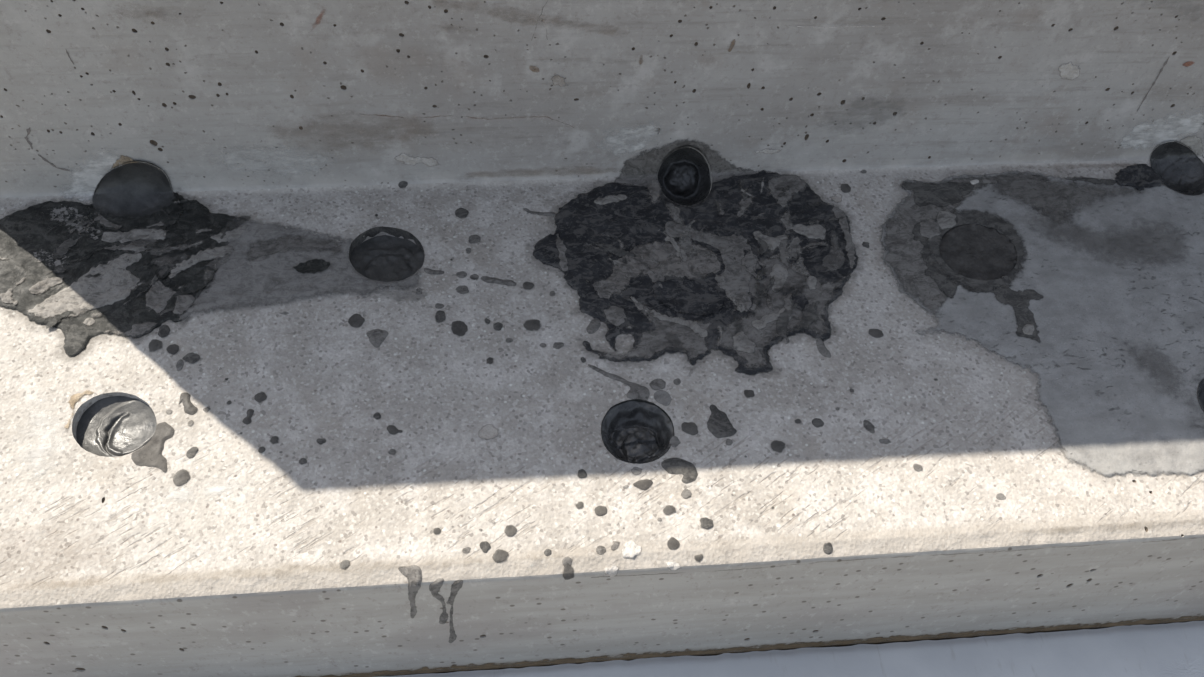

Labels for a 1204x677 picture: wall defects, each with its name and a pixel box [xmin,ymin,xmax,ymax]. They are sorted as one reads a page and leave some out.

damp [1066,176,1116,185]
damp [247,235,341,260]
damp [900,182,1043,343]